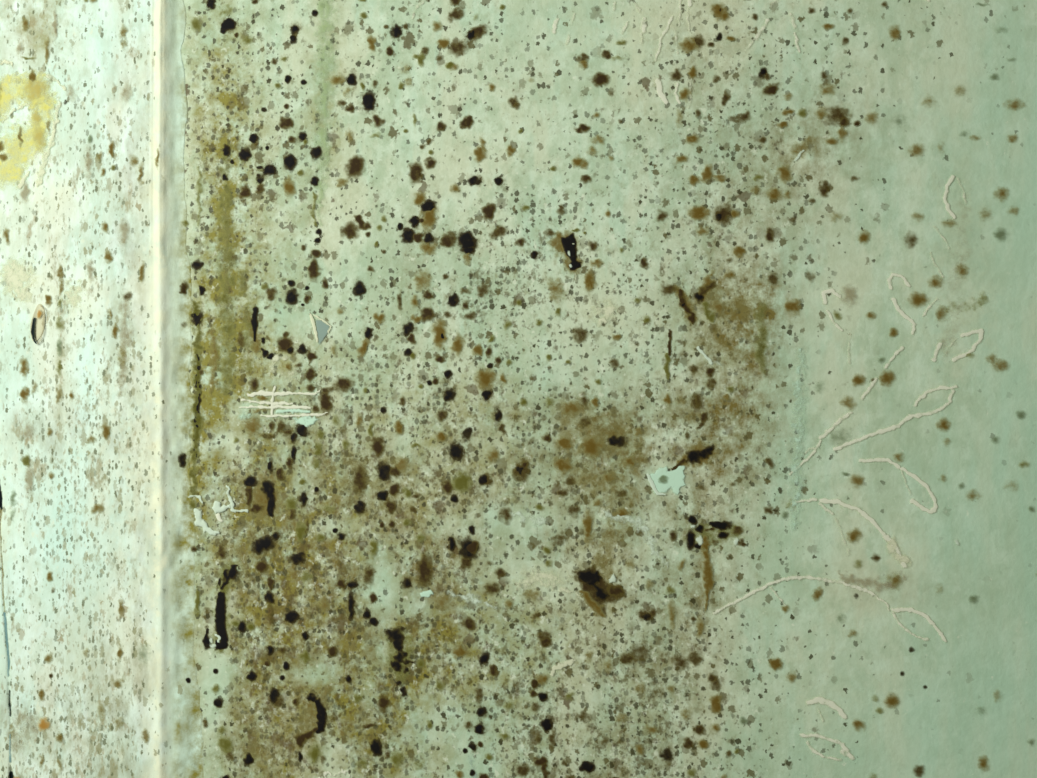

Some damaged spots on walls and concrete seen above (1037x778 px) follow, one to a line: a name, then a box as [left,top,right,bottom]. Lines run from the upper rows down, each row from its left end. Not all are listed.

leakage [346,73,375,110]
leakage [375,199,436,246]
mould [550,228,586,273]
leakage [178,133,324,517]
peeling [310,314,332,343]
peeling [293,416,318,427]
peeling [646,466,685,495]
peeling [188,485,248,536]
crack [0,487,13,778]
leakage [202,564,254,653]
mould [573,554,626,617]
mould [686,515,746,611]